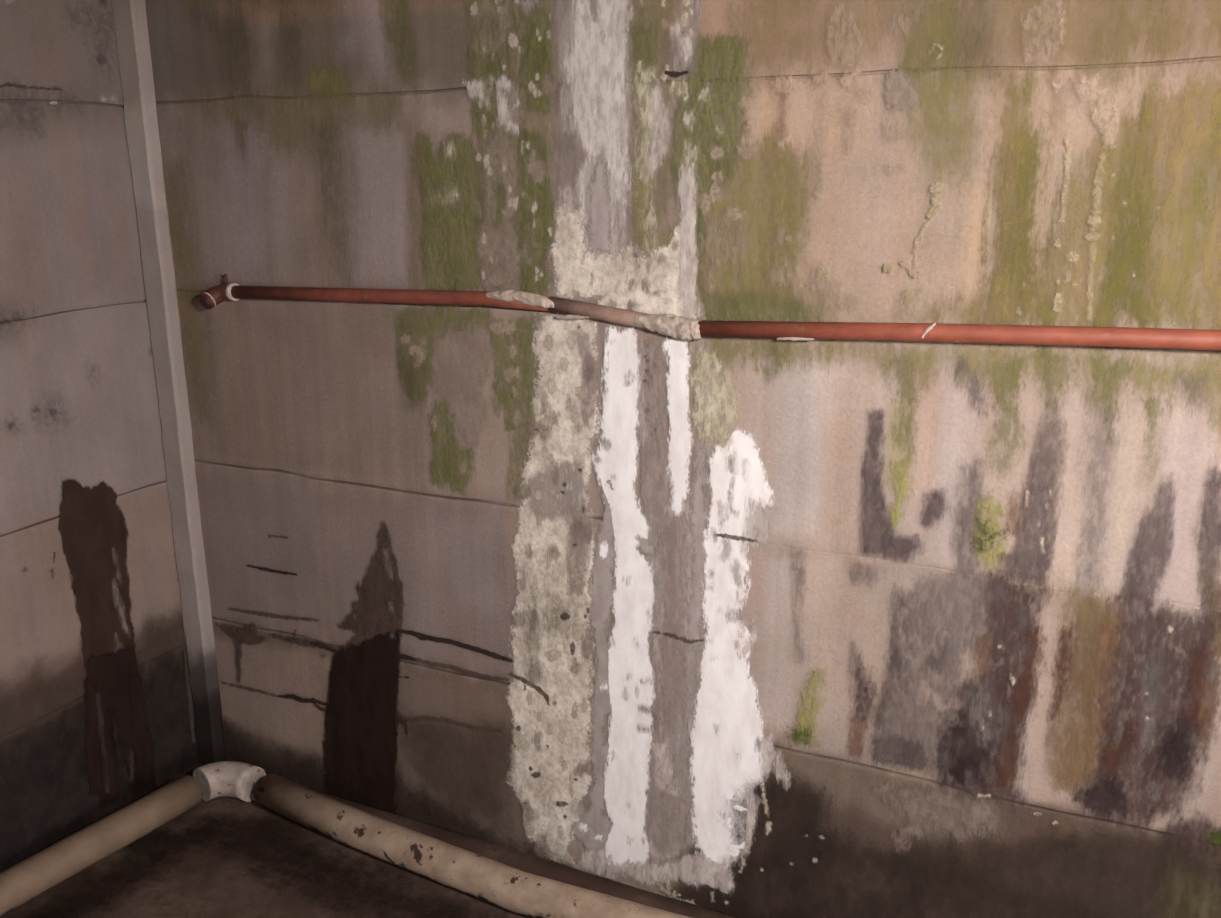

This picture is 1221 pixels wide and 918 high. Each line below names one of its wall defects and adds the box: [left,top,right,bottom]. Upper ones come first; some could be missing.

damp [518,0,702,321]
damp [991,78,1040,324]
crack [247,565,298,576]
damp [0,479,199,872]
crack [222,682,328,711]
crack [229,608,340,656]
crack [398,711,503,734]
crack [395,629,513,681]
damp [215,313,1221,918]
peeling [772,751,790,787]